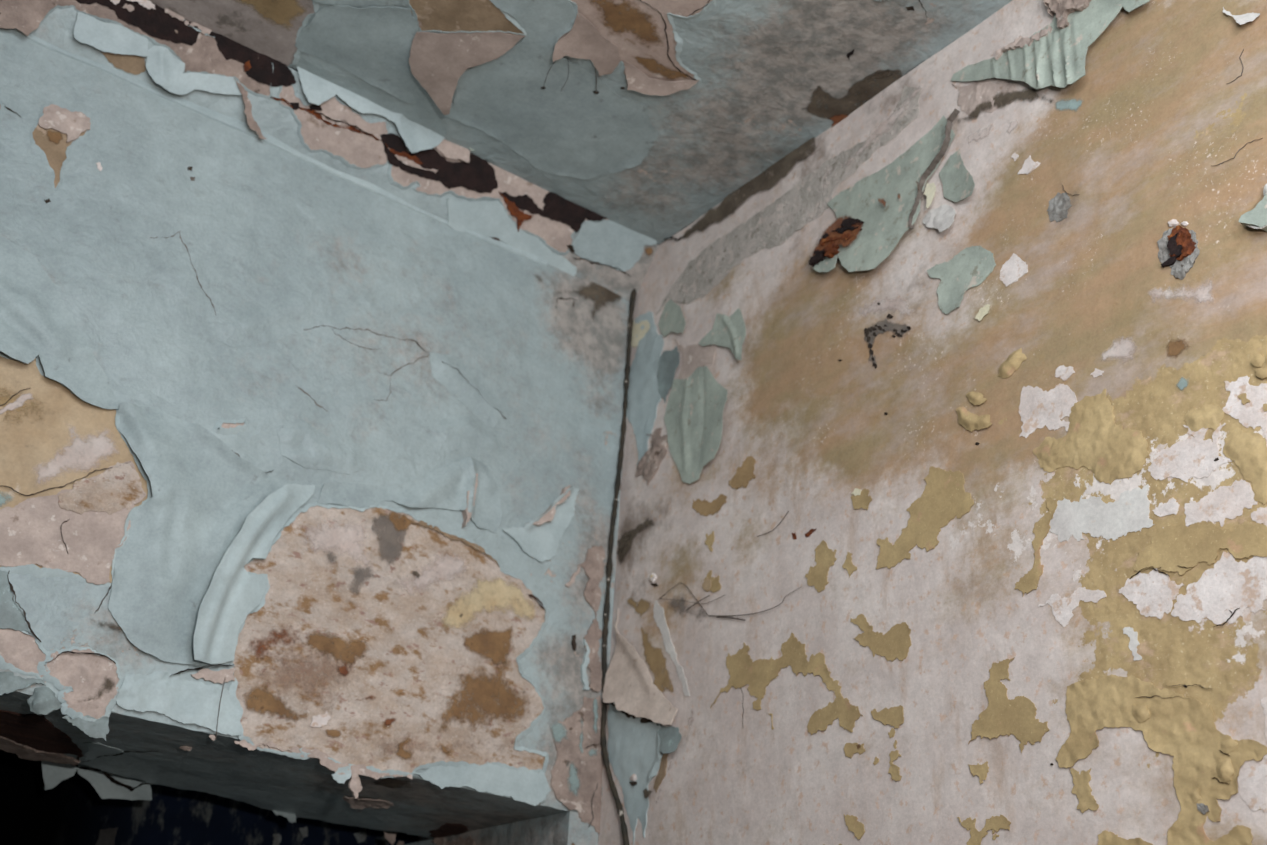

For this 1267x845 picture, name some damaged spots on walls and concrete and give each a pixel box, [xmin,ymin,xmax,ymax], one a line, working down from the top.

flaking render [553,0,716,96]
flaking render [0,0,576,256]
flaking render [631,85,922,484]
corrosion [813,216,863,256]
flaking render [0,351,152,587]
flaking render [1018,365,1078,438]
flaking render [1049,376,1267,542]
flaking render [0,629,123,722]
flaking render [229,502,605,834]
flaking render [1123,627,1142,661]
flaking render [1038,551,1267,627]
flaking render [1238,697,1267,812]